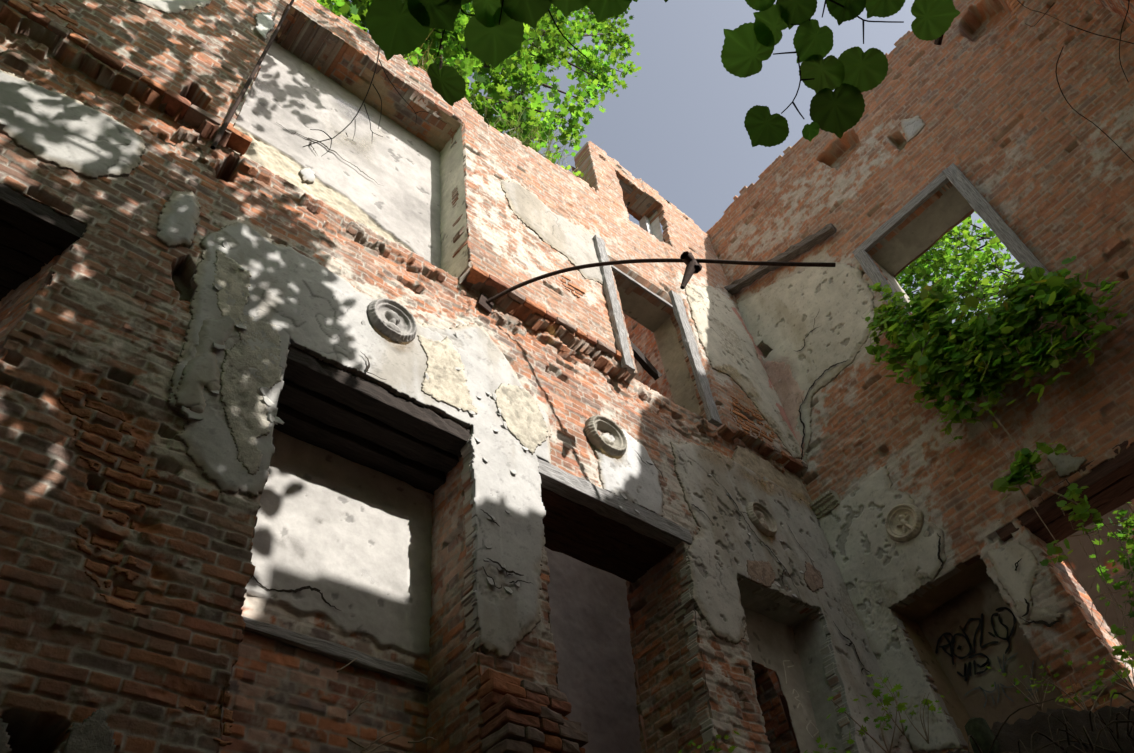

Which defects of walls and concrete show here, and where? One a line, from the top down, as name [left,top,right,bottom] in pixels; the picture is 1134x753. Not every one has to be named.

peeling [210,240,284,475]
peeling [417,331,548,455]
crack [798,360,847,476]
crack [253,576,341,611]
crack [483,558,531,589]